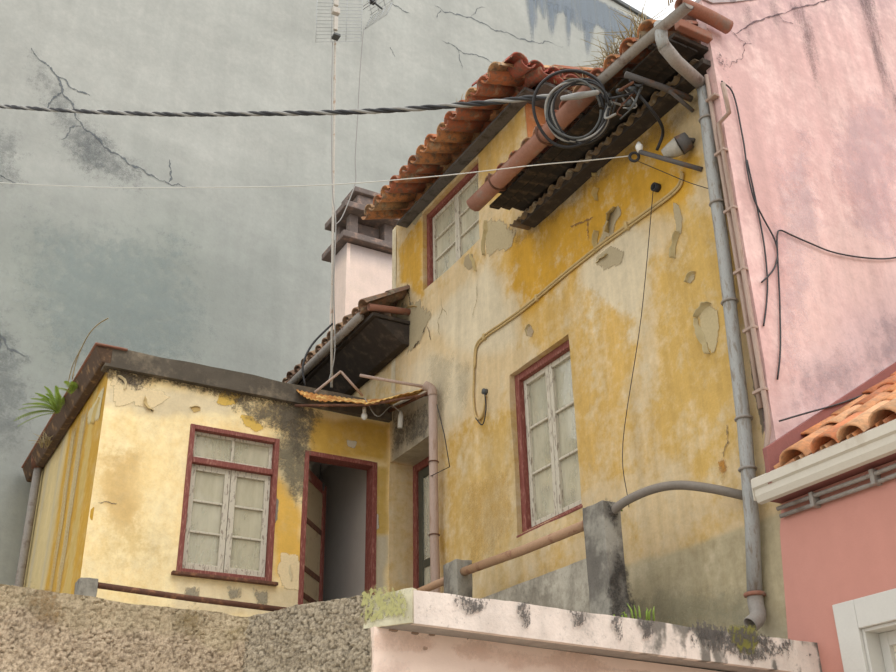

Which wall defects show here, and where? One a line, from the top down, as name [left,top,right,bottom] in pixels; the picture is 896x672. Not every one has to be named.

crack [437,7,560,47]
water stain [527,0,635,50]
crack [731,0,827,64]
crack [31,48,185,187]
peeling [464,219,516,271]
peeling [592,206,624,270]
crack [0,334,25,357]
peeling [693,301,719,354]
water stain [106,368,317,464]
peeling [217,393,240,406]
water stain [517,602,531,628]
water stain [570,610,586,627]